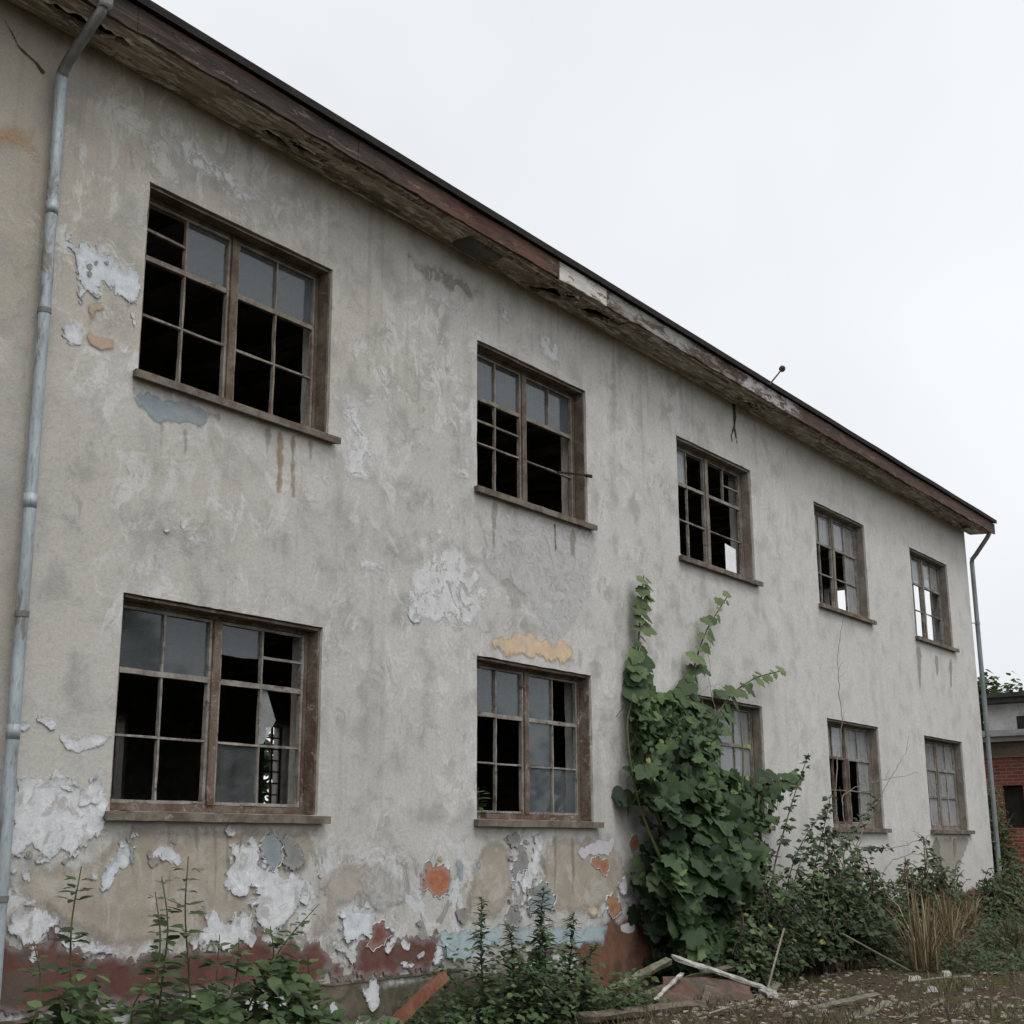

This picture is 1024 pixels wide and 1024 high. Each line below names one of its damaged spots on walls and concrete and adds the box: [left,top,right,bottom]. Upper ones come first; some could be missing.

peeling [62,232,143,354]
peeling [421,266,472,310]
water stain [134,388,220,426]
peeling [407,511,597,663]
peeling [21,715,110,753]
peeling [0,770,657,1024]